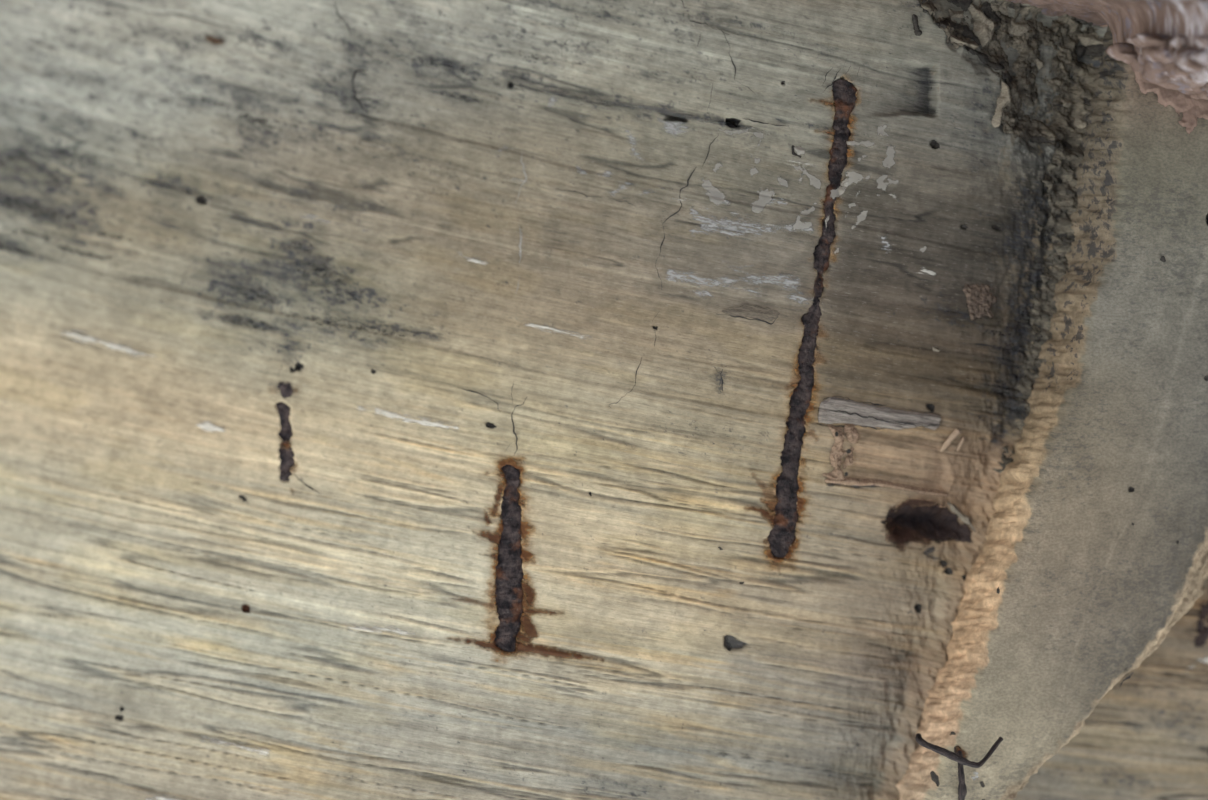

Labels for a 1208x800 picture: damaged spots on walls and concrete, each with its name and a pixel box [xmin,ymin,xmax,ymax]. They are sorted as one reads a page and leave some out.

corrosion [745,79,859,568]
corrosion [276,382,297,482]
corrosion [448,457,604,662]
corrosion [1194,601,1208,647]